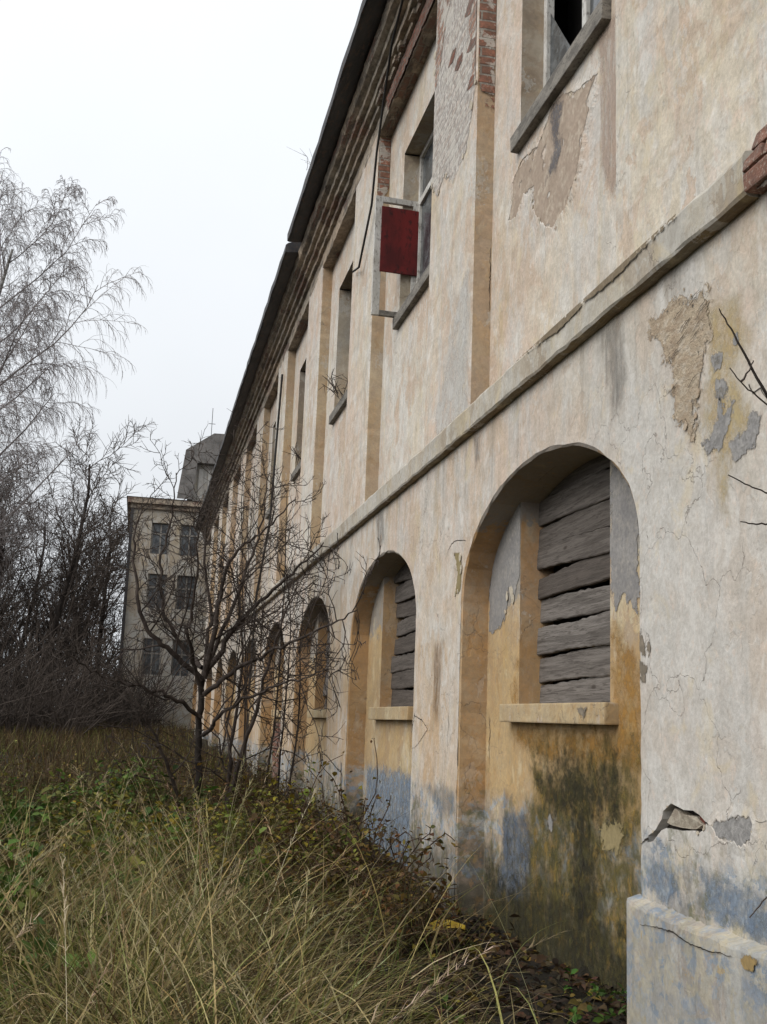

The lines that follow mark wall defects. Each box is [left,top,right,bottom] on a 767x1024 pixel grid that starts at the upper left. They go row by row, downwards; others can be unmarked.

peeling [376,0,496,196]
peeling [505,63,602,242]
flaking render [742,124,767,195]
flaking render [647,283,761,462]
peeling [489,504,520,634]
water stain [482,634,641,995]
flaking render [707,803,760,857]
crack [640,924,729,957]